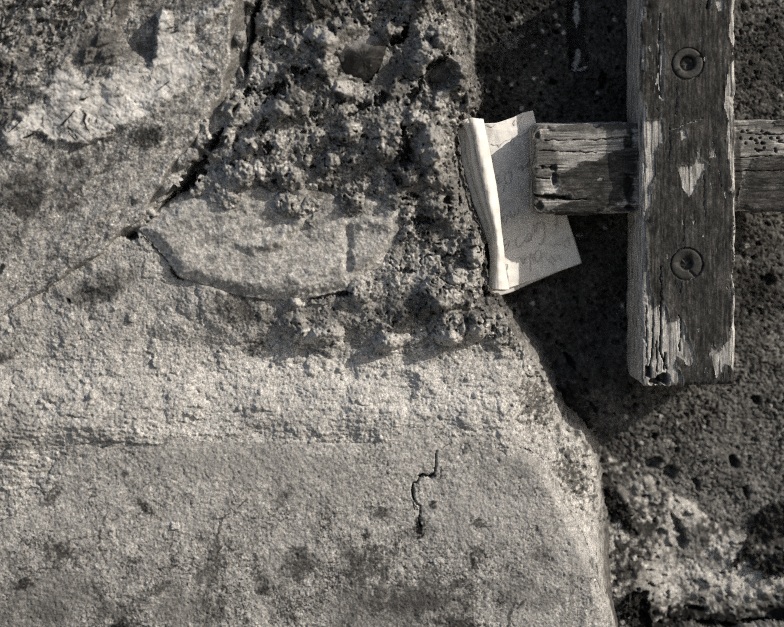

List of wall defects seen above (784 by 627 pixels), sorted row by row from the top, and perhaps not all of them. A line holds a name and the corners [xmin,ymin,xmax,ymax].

crack [396,468,439,516]